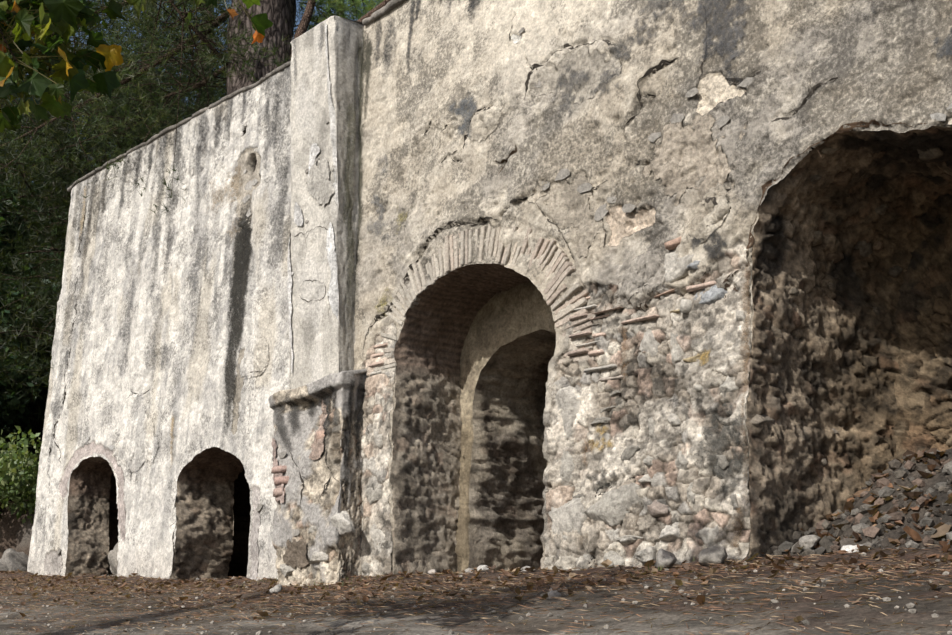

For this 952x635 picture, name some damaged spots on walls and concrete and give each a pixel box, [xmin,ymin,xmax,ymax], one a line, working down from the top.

leakage [406,0,421,67]
crack [509,13,614,99]
leakage [552,0,749,112]
crack [624,57,679,140]
flaking render [642,72,754,207]
crack [726,65,767,95]
crack [771,77,838,122]
leakage [223,203,252,435]
flaking render [271,438,289,503]
flaking render [309,399,327,460]
flaking render [543,237,752,571]
flaking render [280,524,329,578]